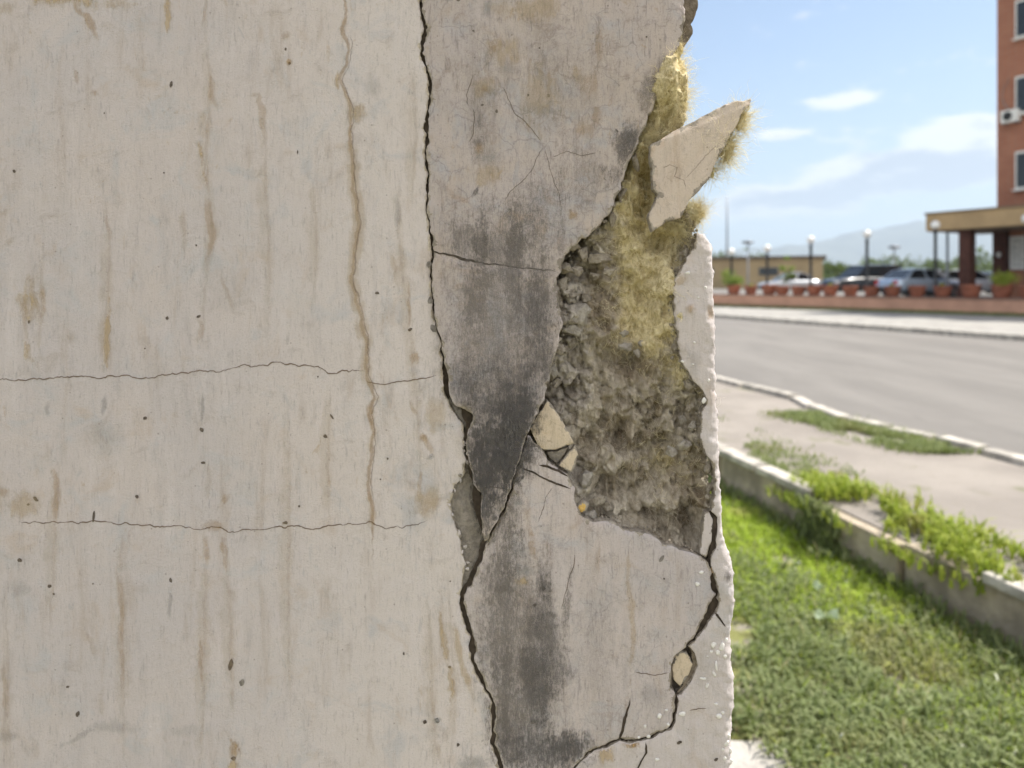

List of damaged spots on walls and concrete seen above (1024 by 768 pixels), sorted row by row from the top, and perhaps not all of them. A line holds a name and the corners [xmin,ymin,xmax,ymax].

crack [504,89,593,204]
crack [0,0,570,768]
water stain [458,259,552,534]
spalling [530,33,768,562]
water stain [494,610,588,768]
crack [574,511,725,768]